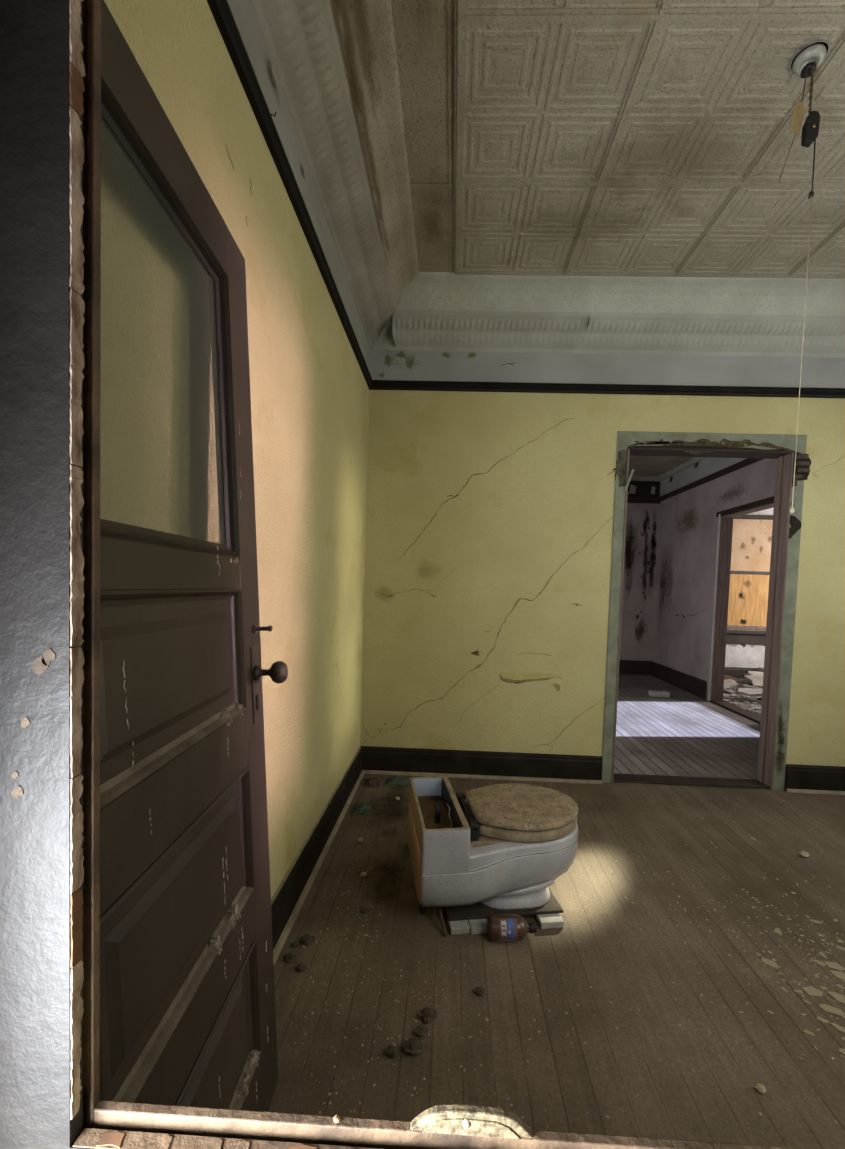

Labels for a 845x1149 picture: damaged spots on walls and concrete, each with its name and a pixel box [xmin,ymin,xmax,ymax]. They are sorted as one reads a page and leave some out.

crack [398,418,572,560]
crack [363,520,609,738]
leakage [625,513,667,607]
flaking render [607,438,811,497]